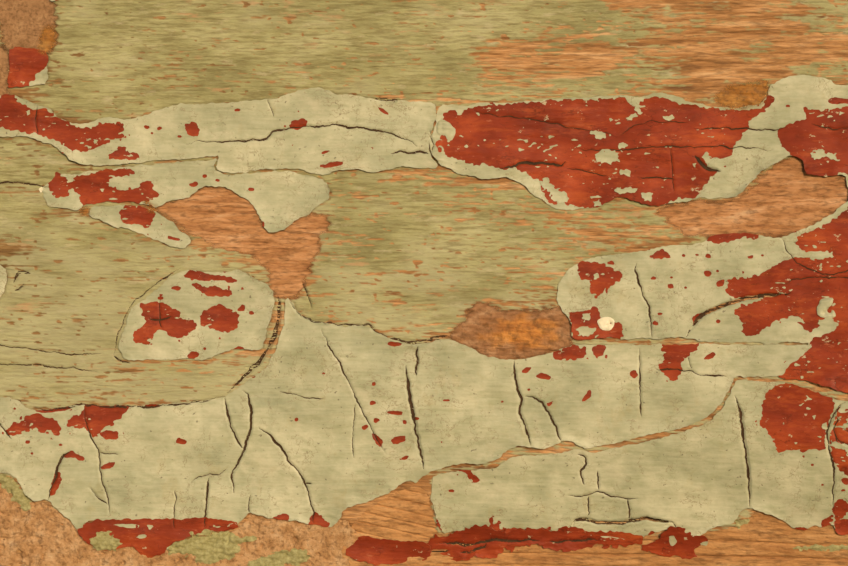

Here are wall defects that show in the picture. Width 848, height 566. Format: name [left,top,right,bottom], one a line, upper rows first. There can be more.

peeling [0,0,438,361]
peeling [429,102,584,210]
crack [38,284,449,527]
crack [513,363,561,445]
spalling [569,306,624,340]
crack [634,263,724,414]
crack [735,397,750,506]
crack [687,237,848,336]
spalling [760,383,846,453]
spalling [829,401,848,476]
peeling [835,374,848,393]
crack [431,454,677,554]